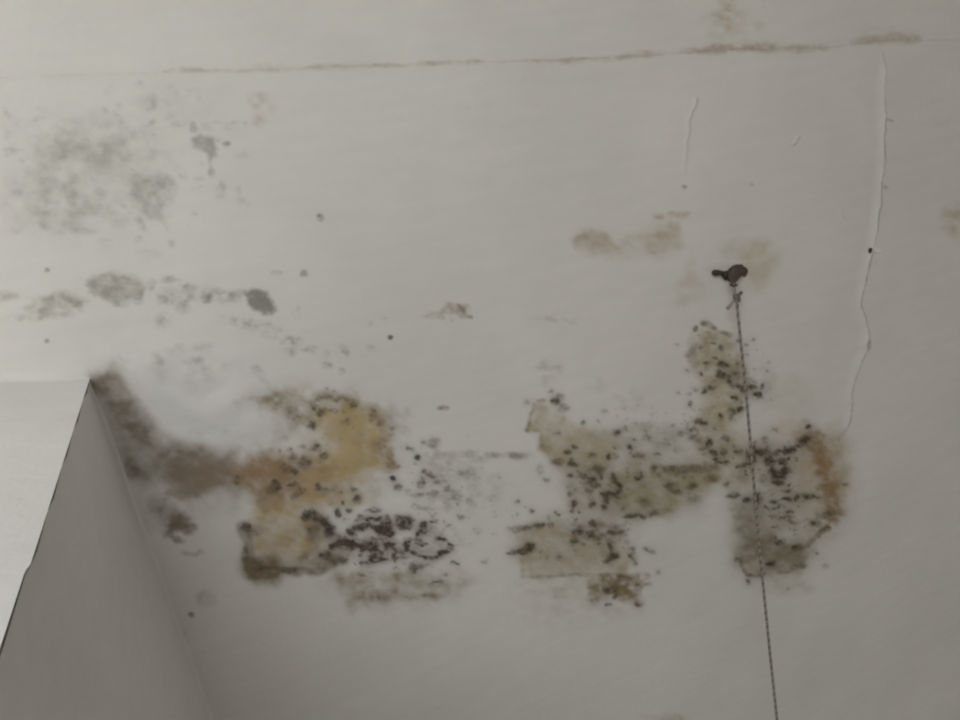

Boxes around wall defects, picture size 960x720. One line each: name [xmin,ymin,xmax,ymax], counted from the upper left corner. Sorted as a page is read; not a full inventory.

mould [0,73,254,262]
crack [0,24,960,442]
water stain [80,312,868,636]